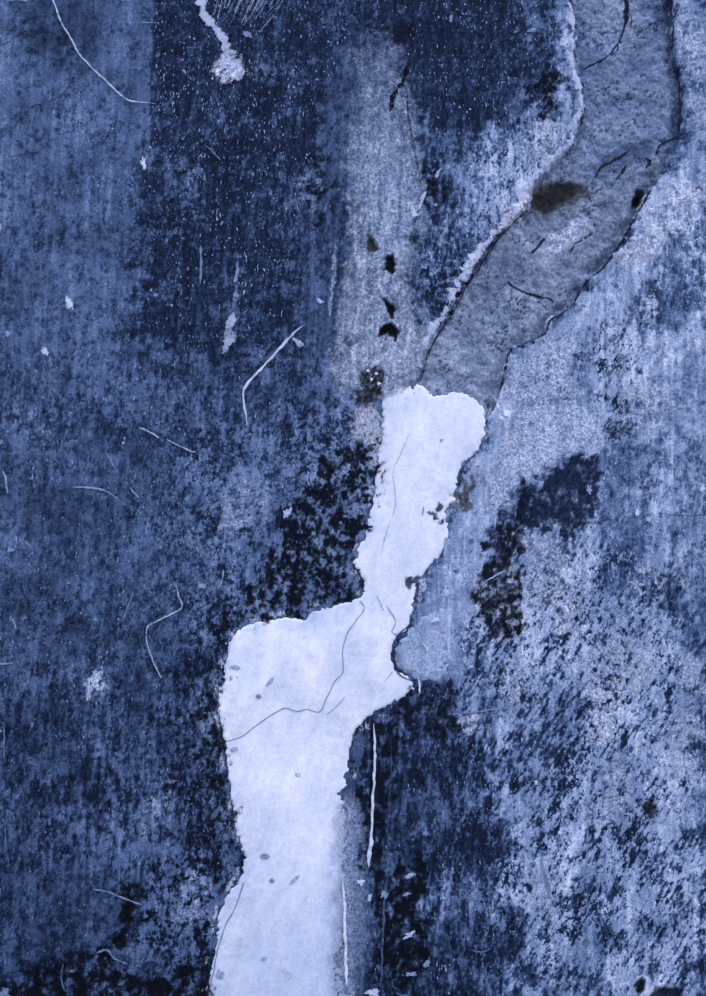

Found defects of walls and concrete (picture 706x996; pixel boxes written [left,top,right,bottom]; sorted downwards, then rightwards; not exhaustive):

crack [490,0,683,414]
spalling [366,234,396,275]
spalling [378,297,400,342]
crack [420,210,528,381]
spalling [416,0,706,635]
peeling [222,478,268,539]
peeling [350,732,366,767]
peeling [457,714,480,735]